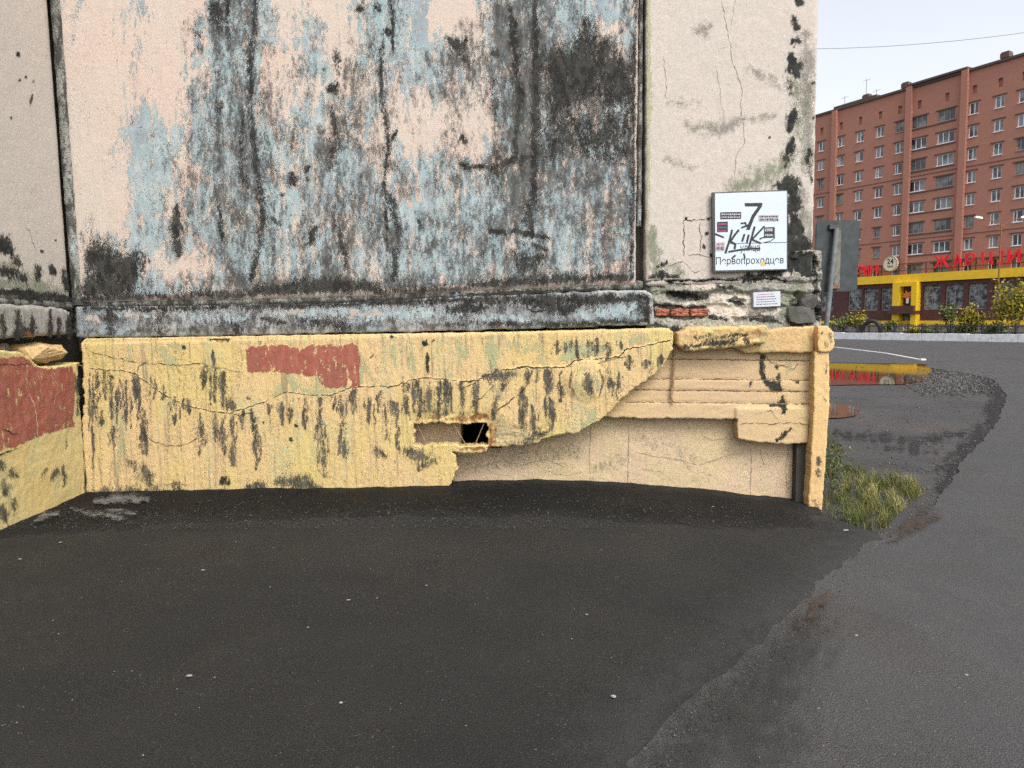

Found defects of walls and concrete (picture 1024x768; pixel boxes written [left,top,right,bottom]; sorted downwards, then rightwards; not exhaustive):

crack [717,4,745,176]
peeling [79,0,654,297]
water stain [0,0,833,398]
peeling [654,283,787,323]
water stain [72,351,479,520]
crack [91,340,670,416]
water stain [518,367,566,442]
peeling [749,353,804,415]
water stain [41,464,68,488]